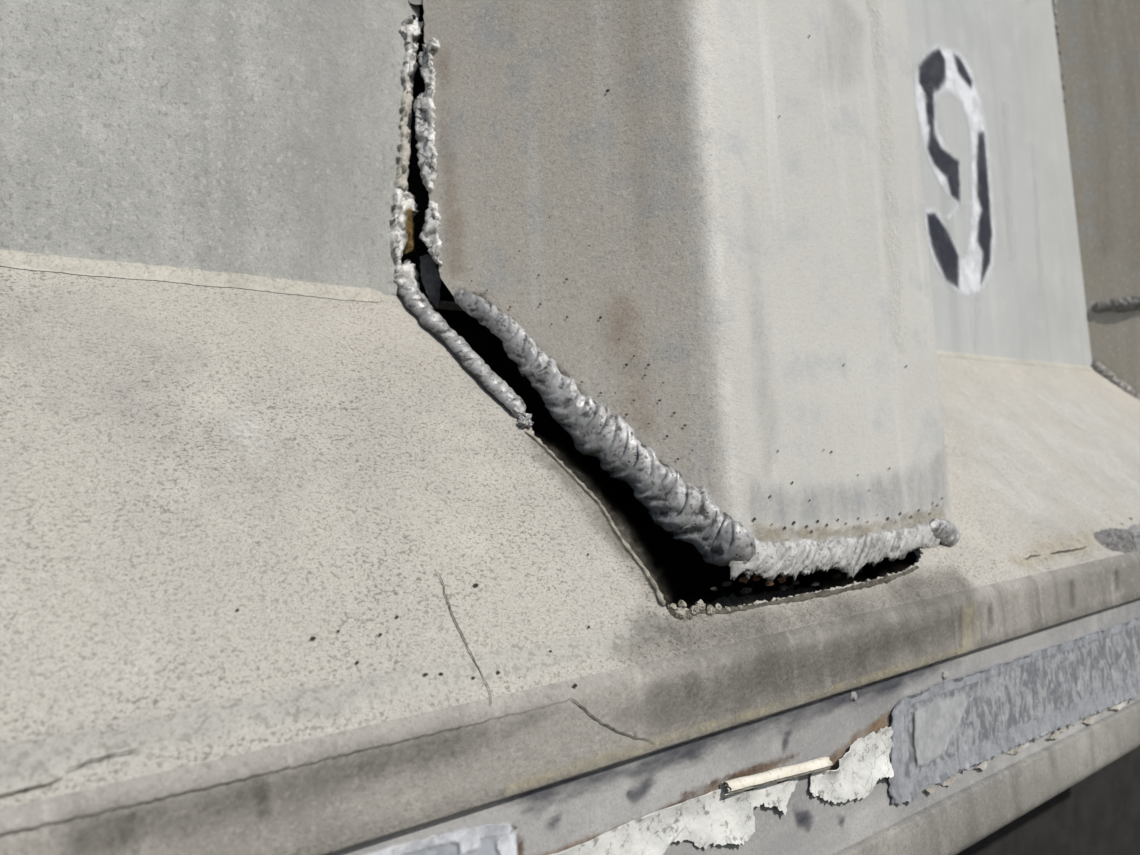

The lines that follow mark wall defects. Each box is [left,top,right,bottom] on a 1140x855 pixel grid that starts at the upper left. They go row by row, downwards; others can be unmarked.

crack [389,14,446,308]
crack [511,407,919,619]
crack [0,569,657,835]
peeling [551,726,894,855]